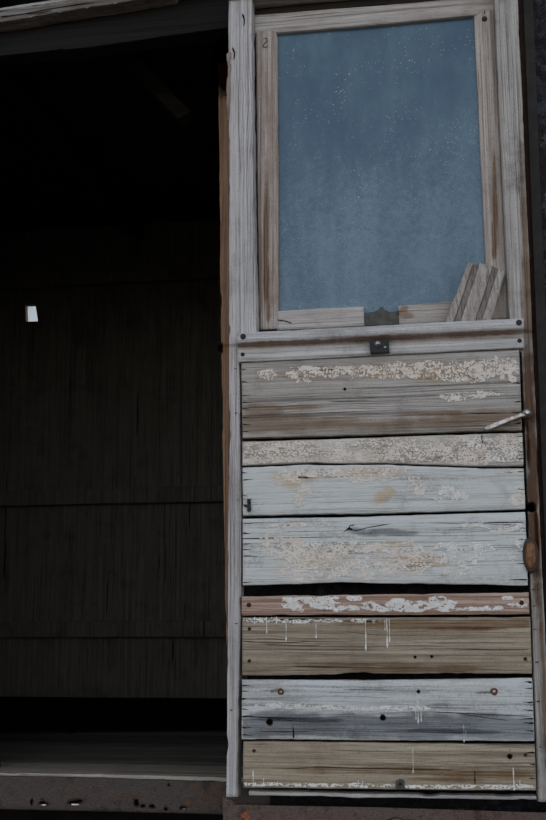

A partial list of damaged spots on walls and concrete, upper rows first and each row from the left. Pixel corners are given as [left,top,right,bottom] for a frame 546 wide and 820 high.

peeling [256,355,519,402]
peeling [243,434,524,507]
peeling [255,522,496,582]
peeling [459,521,526,562]
peeling [243,596,528,624]